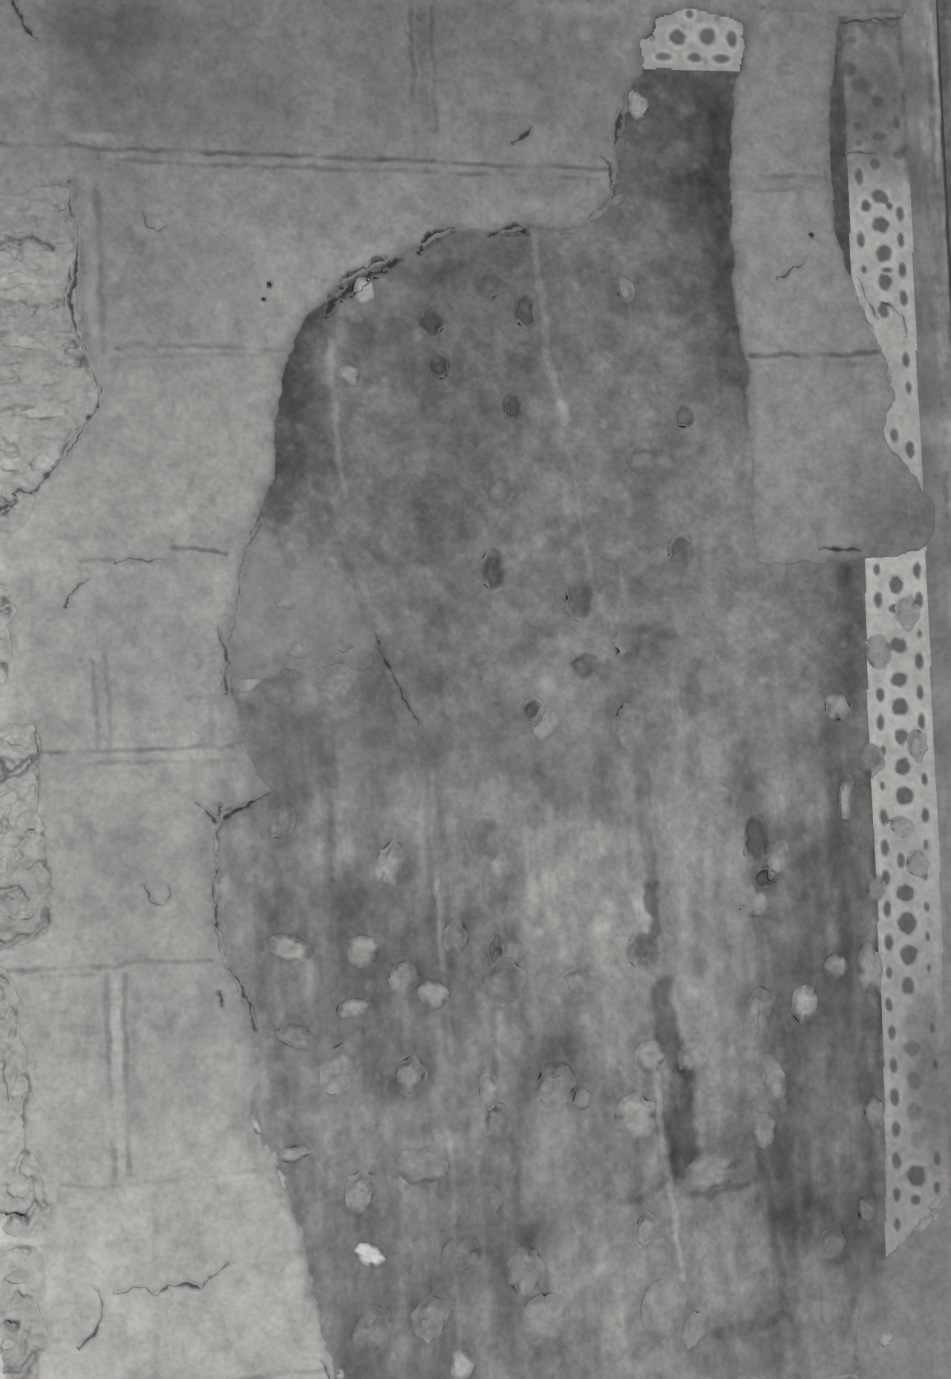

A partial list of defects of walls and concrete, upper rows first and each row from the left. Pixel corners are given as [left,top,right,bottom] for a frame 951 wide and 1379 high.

crack [9,0,38,41]
spalling [0,186,98,538]
spalling [0,585,17,693]
spalling [0,725,53,950]
crack [142,885,173,908]
crack [194,792,269,1032]
hole [743,816,777,890]
spalling [0,967,50,1379]
crack [78,1262,229,1351]